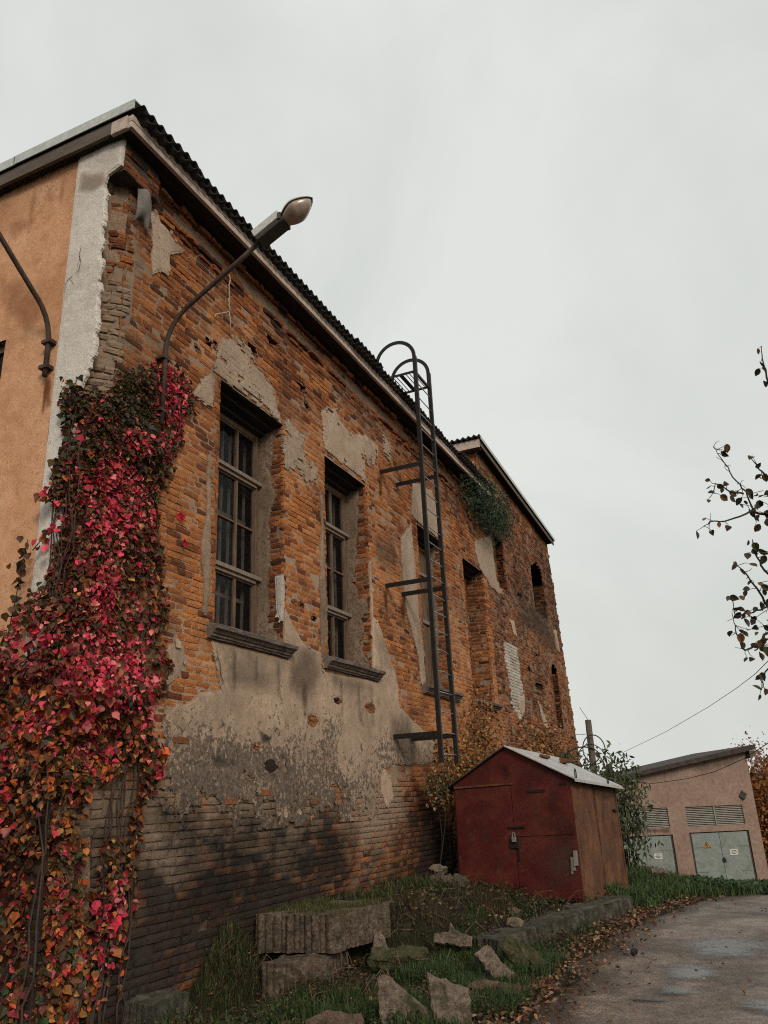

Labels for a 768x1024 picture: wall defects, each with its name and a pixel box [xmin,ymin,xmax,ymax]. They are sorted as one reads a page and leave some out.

flaking render [150,209,184,276]
flaking render [151,335,435,832]
flaking render [474,535,503,595]